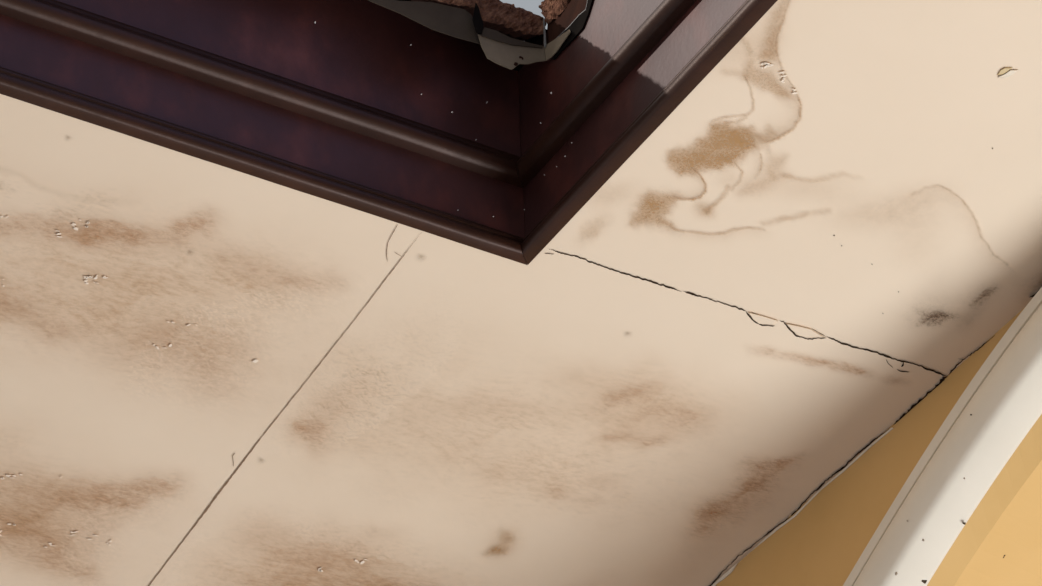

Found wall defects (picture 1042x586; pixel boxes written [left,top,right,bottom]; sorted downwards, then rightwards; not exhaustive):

water stain [670,125,755,201]
crack [545,249,995,586]